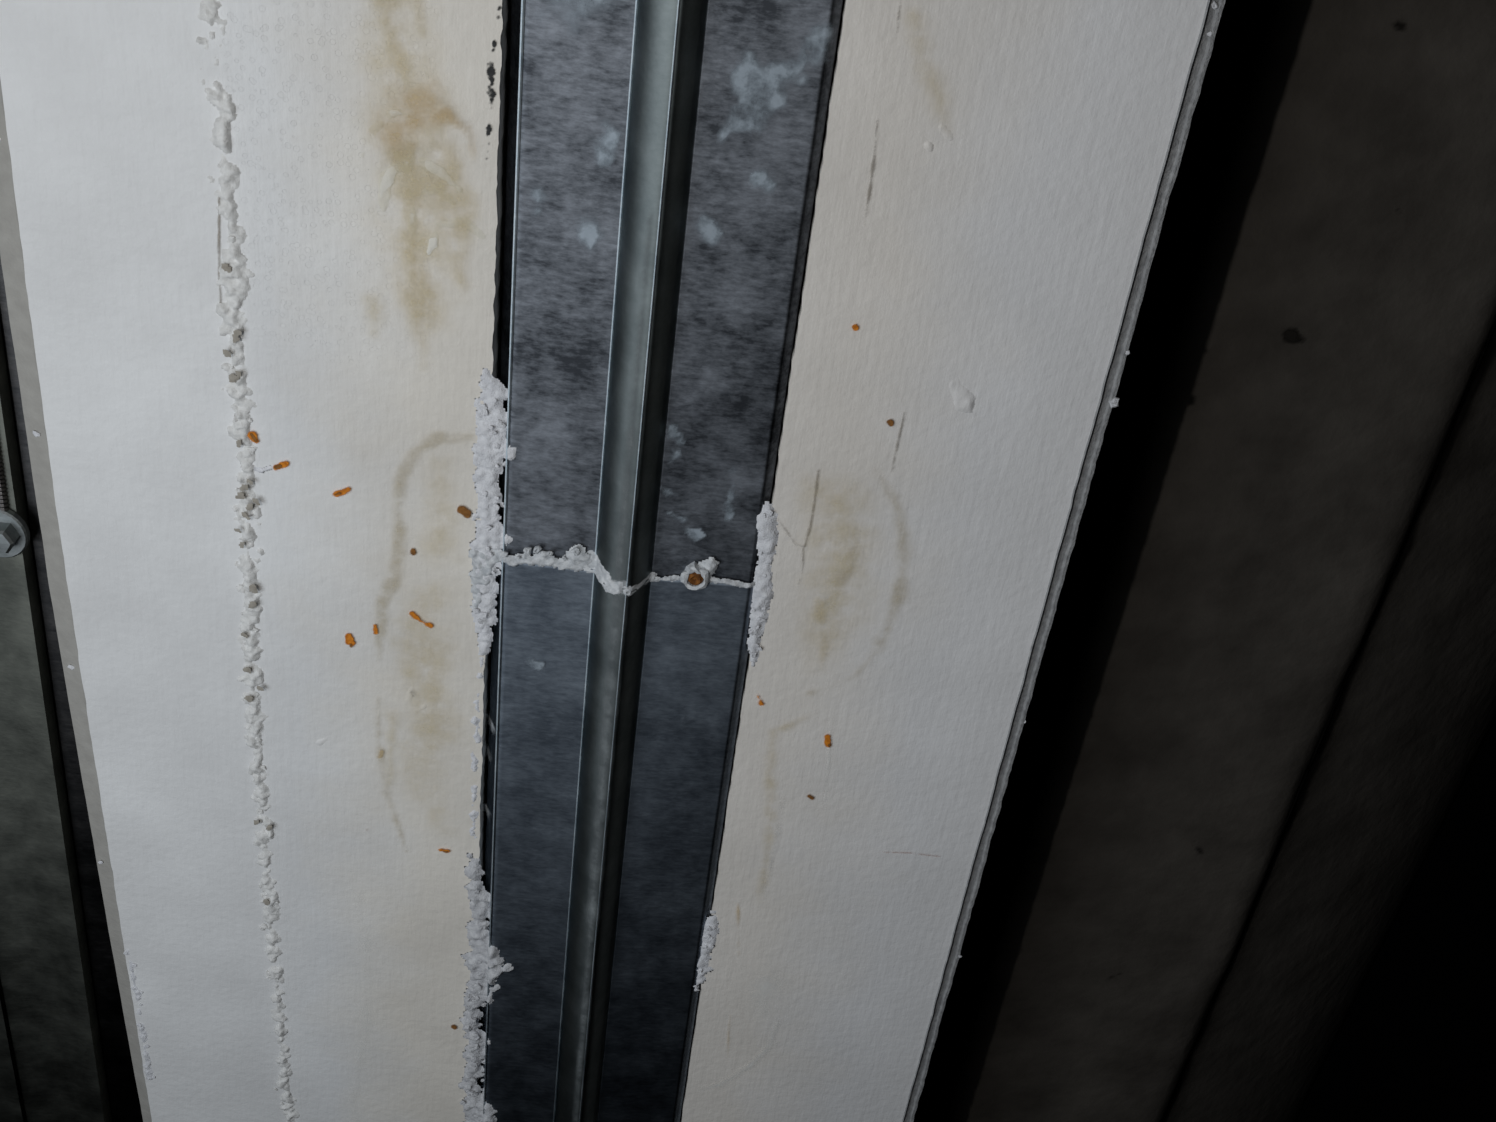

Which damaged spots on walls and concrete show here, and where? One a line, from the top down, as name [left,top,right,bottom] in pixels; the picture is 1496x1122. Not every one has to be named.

damp [668,425,683,459]
corrosion [253,461,289,473]
corrosion [457,506,471,518]
damp [668,512,706,541]